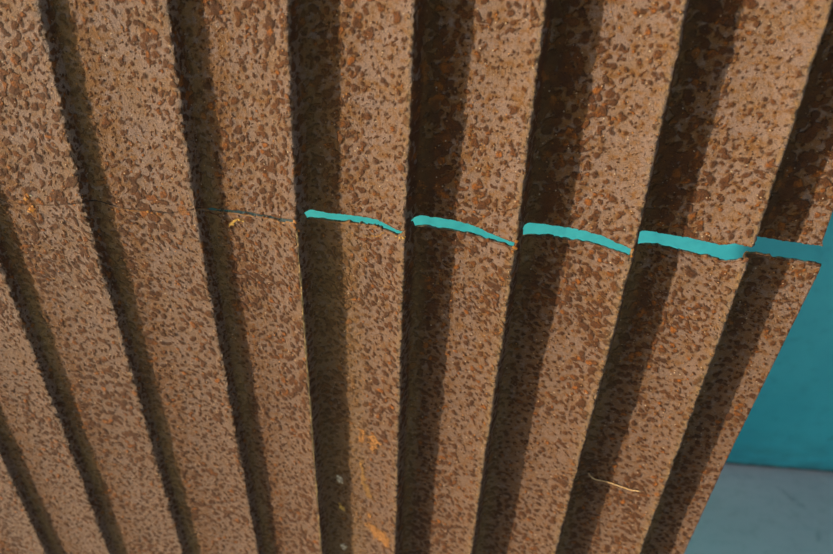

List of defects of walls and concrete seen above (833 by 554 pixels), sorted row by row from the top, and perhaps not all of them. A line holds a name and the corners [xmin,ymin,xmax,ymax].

crack [0,199,817,554]